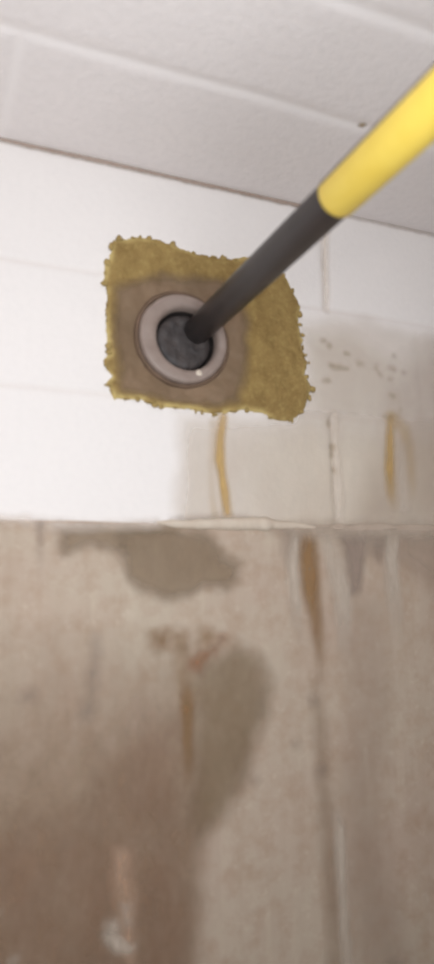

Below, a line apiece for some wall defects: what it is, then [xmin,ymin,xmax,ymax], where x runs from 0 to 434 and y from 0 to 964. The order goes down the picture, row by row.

rust [216,416,229,514]
water stain [64,530,236,596]
rust [302,530,319,625]